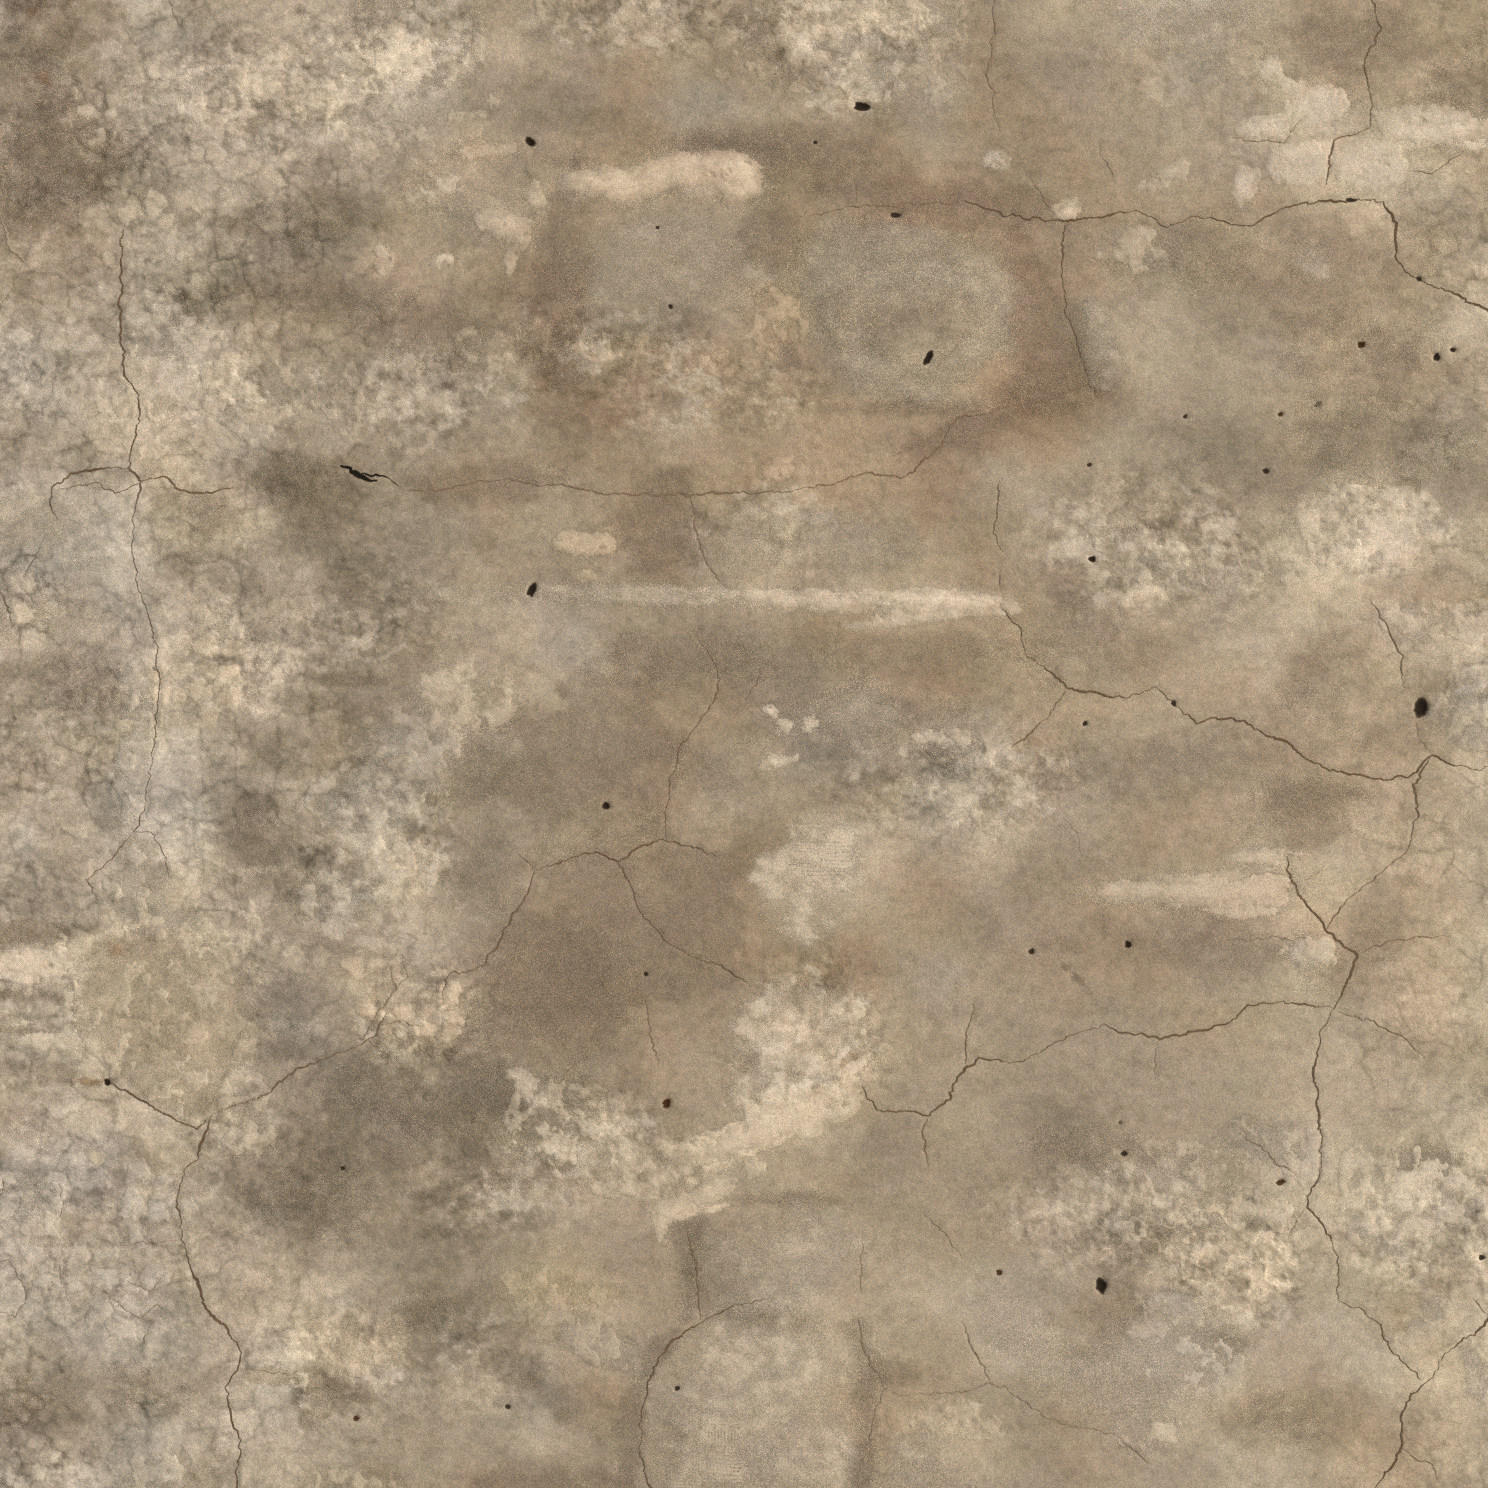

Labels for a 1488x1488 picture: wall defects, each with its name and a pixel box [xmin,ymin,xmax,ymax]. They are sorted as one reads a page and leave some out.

peeling [115,189,201,232]
peeling [136,0,536,216]
spalling [563,148,767,203]
crack [331,0,1488,585]
damp [806,179,1127,449]
damp [983,151,1011,170]
peeling [1230,54,1488,209]
crack [0,229,233,901]
spalling [715,587,1022,627]
crack [108,636,771,1488]
peeling [502,988,874,1242]
crack [858,482,1488,1488]